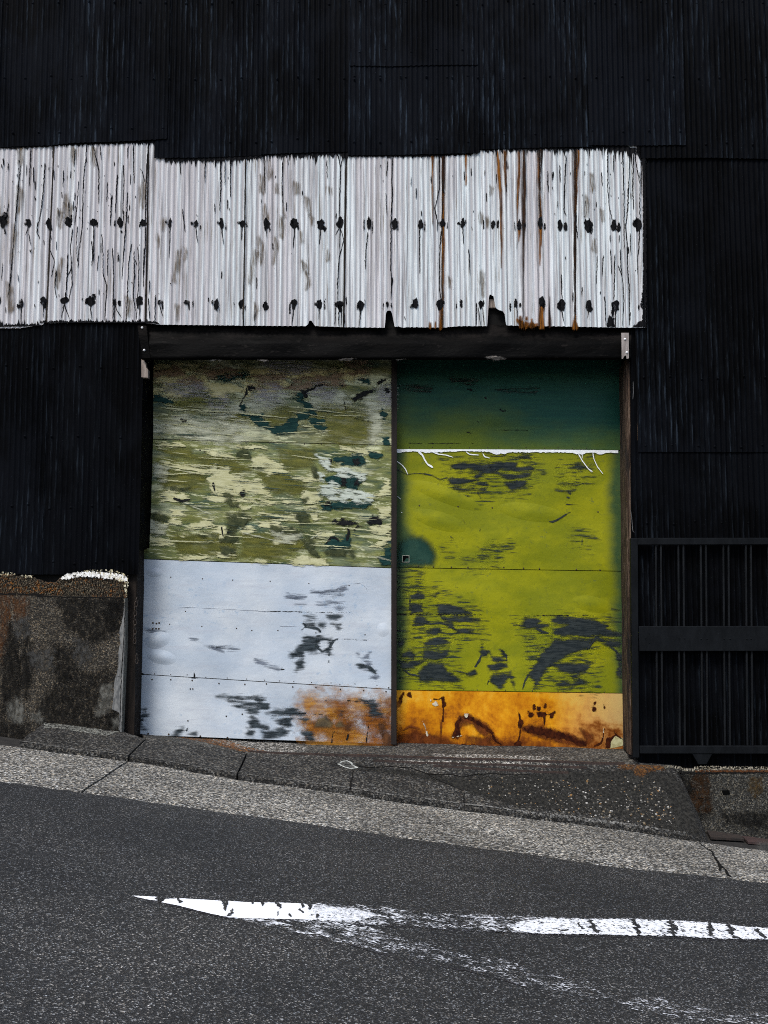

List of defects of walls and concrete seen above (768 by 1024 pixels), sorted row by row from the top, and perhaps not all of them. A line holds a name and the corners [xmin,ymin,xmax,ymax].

damp [45,146,72,321]
damp [140,144,164,321]
damp [242,160,284,326]
rust [429,155,445,330]
rust [497,149,551,329]
rust [572,150,580,330]
peeling [150,358,546,567]
peeling [555,453,596,495]
peeling [217,695,383,743]
peeling [286,587,347,671]
rust [297,692,593,747]
peeling [397,581,622,692]